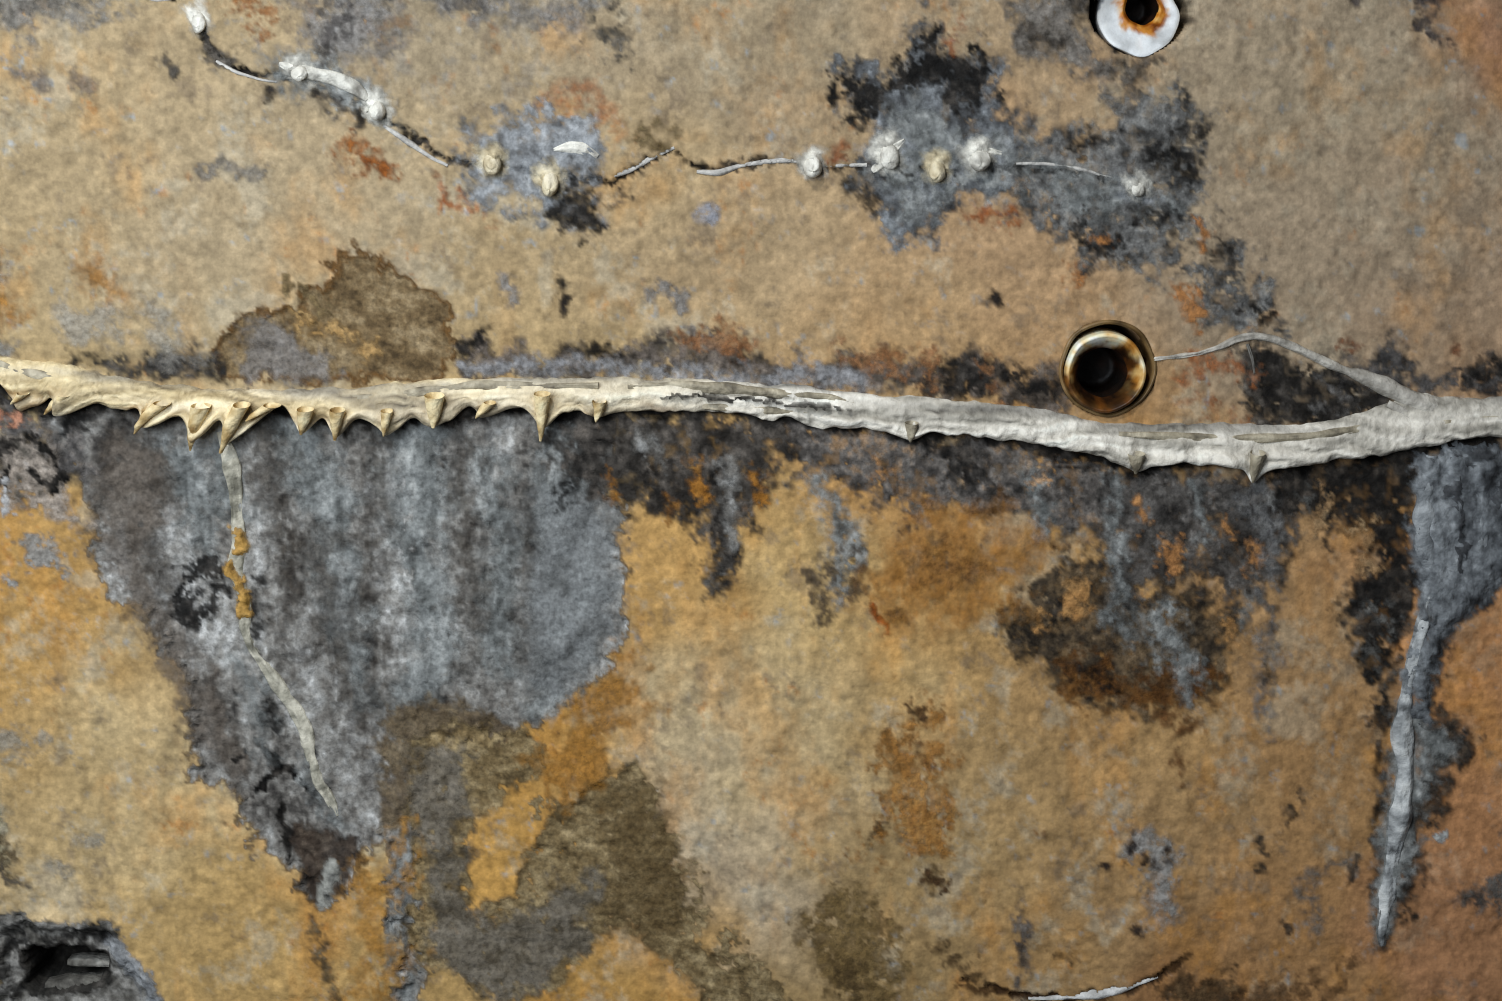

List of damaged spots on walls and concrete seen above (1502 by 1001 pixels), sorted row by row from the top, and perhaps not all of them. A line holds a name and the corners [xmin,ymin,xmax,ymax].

crack [150,0,1152,244]
crack [0,332,1502,483]
water stain [826,0,1502,425]
water stain [211,424,344,829]
peeling [0,406,792,1001]
water stain [541,411,1502,951]